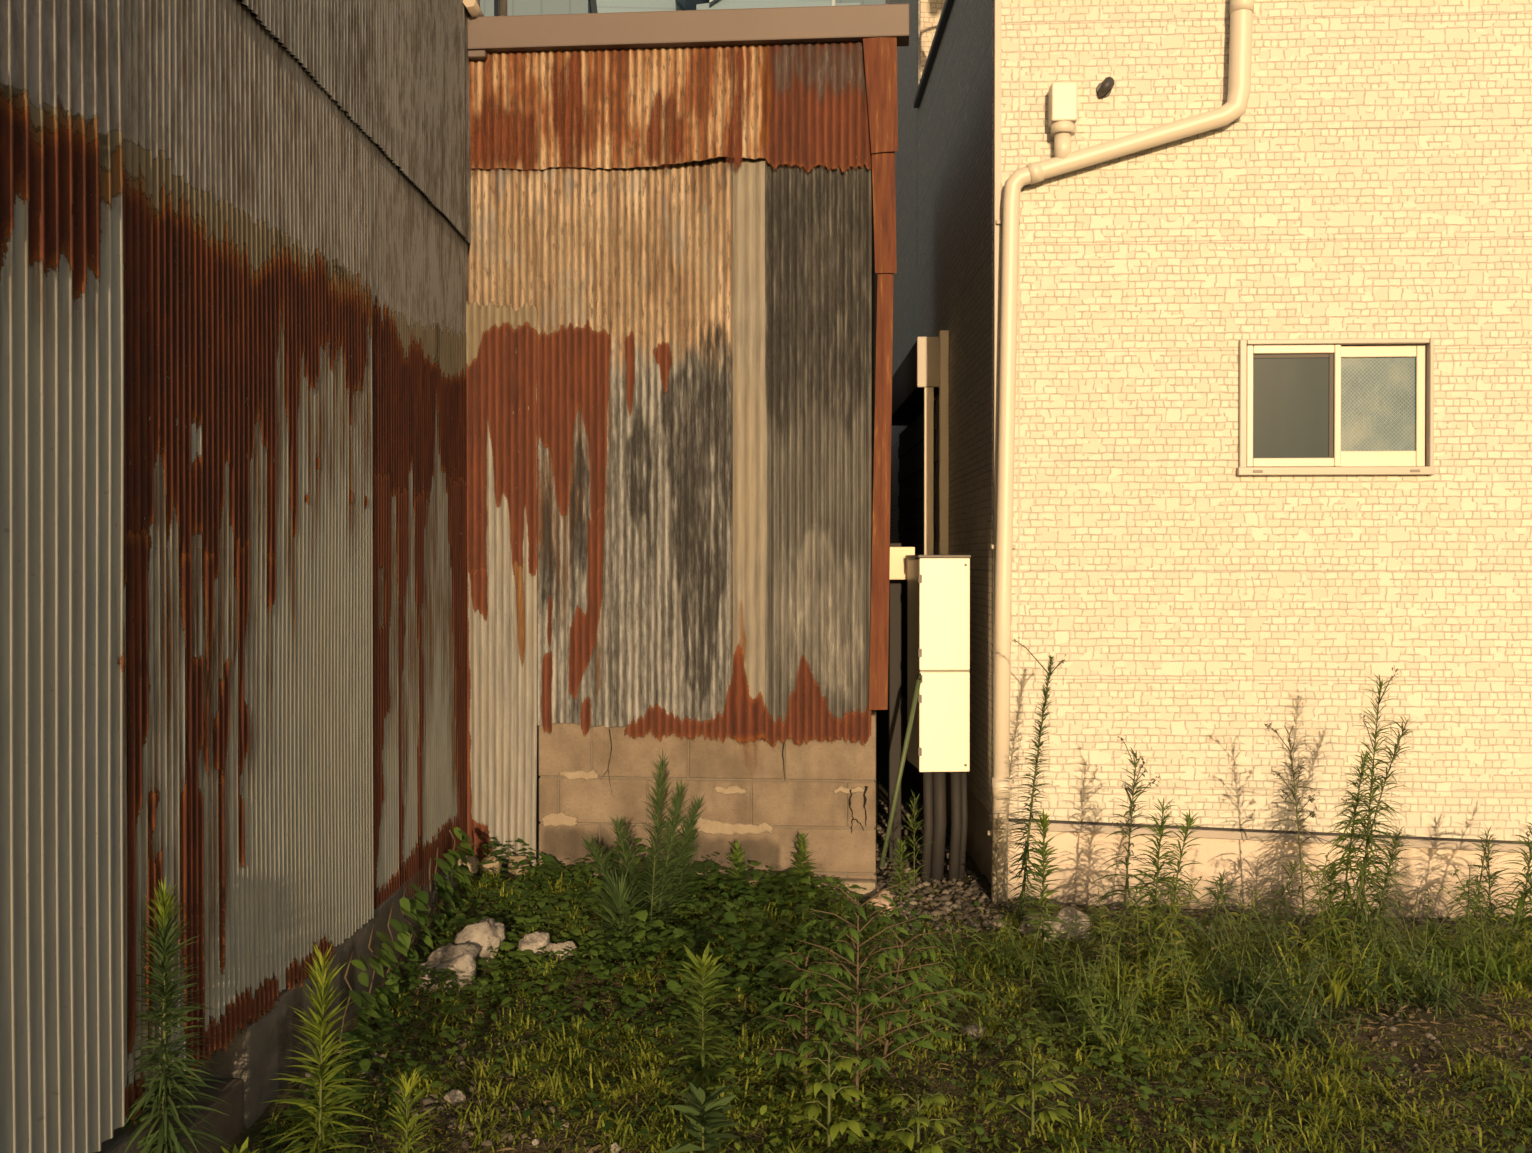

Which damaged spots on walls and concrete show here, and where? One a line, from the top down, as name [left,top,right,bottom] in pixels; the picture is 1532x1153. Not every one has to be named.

rust [470,103,537,172]
rust [551,50,583,167]
rust [647,93,682,170]
rust [727,46,745,168]
rust [762,41,872,173]
rust [0,92,102,302]
rust [653,341,672,393]
damp [627,325,733,705]
rust [118,165,635,1084]
rust [624,634,871,748]
rust [125,1071,145,1125]